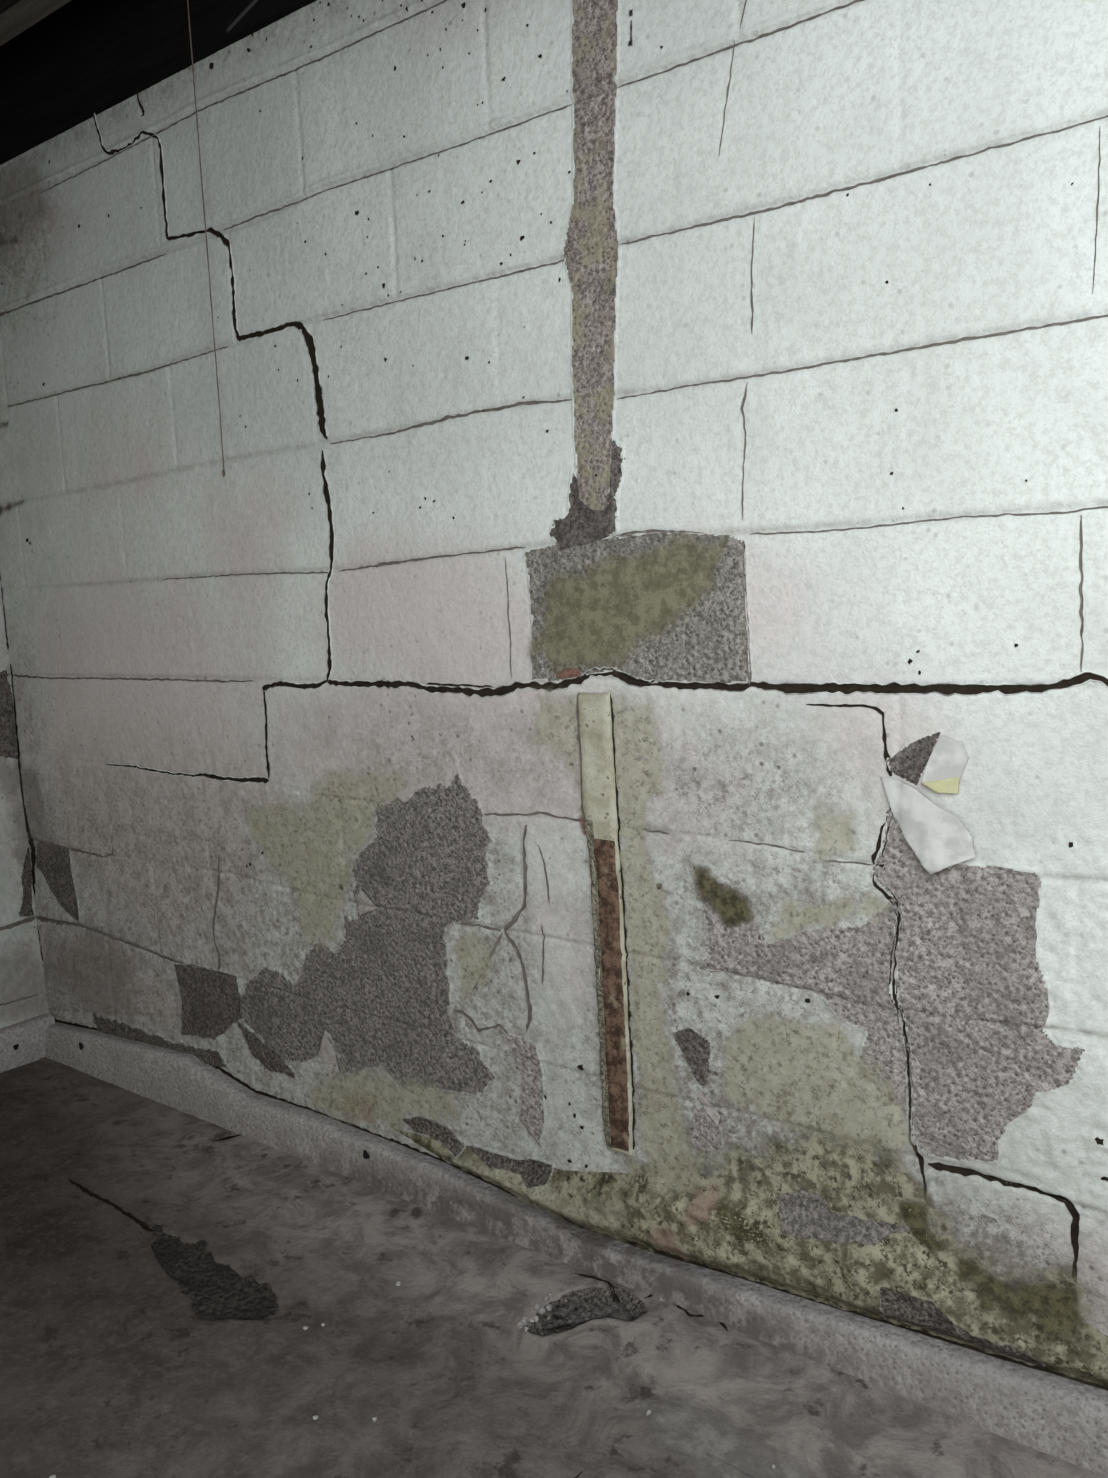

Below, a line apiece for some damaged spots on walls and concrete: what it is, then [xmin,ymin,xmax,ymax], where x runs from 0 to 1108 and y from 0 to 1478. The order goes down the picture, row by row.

crack [0,0,1108,971]
peeling [523,0,752,684]
peeling [0,667,18,763]
peeling [17,837,80,924]
crack [0,994,97,1030]
peeling [93,770,498,1098]
peeling [402,1033,555,1189]
crack [439,811,581,1034]
corrosion [556,668,635,1157]
crack [209,1064,1108,1391]
peeling [688,728,1088,1165]
crack [699,808,1080,1333]